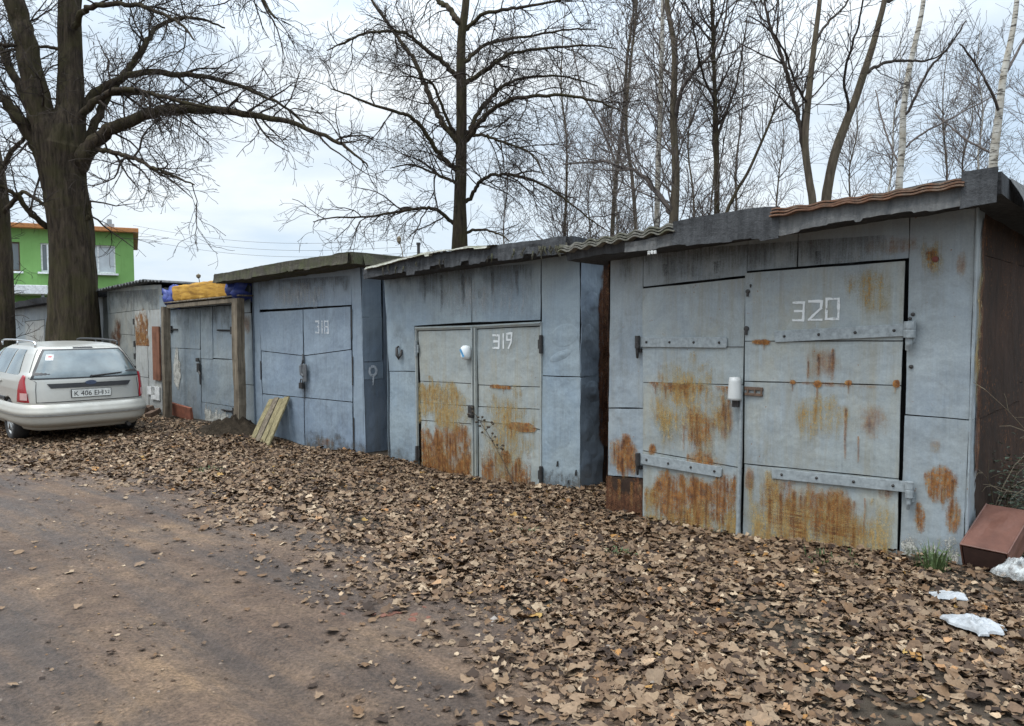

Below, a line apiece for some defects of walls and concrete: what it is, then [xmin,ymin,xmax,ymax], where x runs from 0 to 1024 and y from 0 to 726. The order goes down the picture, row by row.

corrosion [135,310,149,346]
corrosion [974,218,986,474]
corrosion [418,376,536,483]
corrosion [598,270,892,554]
corrosion [915,465,961,532]